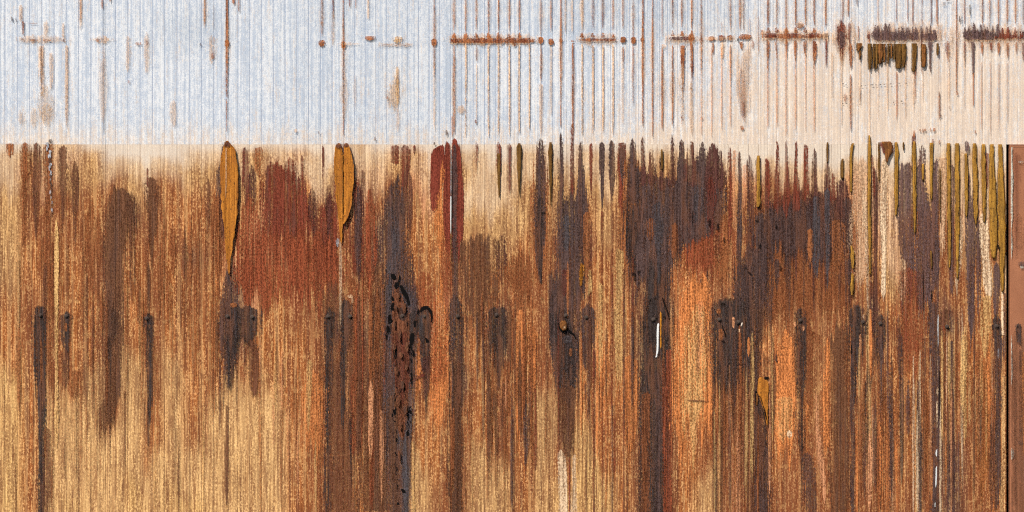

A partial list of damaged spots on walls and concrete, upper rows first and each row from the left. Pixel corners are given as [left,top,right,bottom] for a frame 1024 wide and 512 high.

rust [6,142,192,512]
rust [207,0,418,512]
rust [415,0,1024,512]